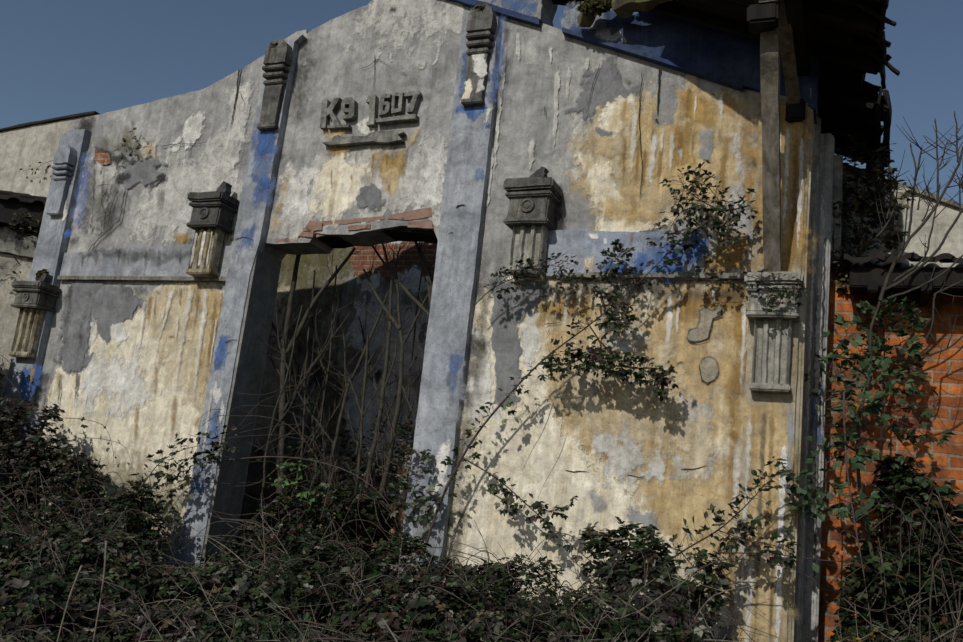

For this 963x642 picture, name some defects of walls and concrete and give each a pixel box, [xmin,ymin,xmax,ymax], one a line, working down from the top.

peeling [456,0,537,128]
peeling [561,2,627,43]
peeling [62,82,447,247]
water stain [648,133,682,183]
water stain [542,288,581,321]
peeling [428,53,757,642]
water stain [620,284,680,345]
peeling [8,280,228,552]
water stain [731,194,848,642]